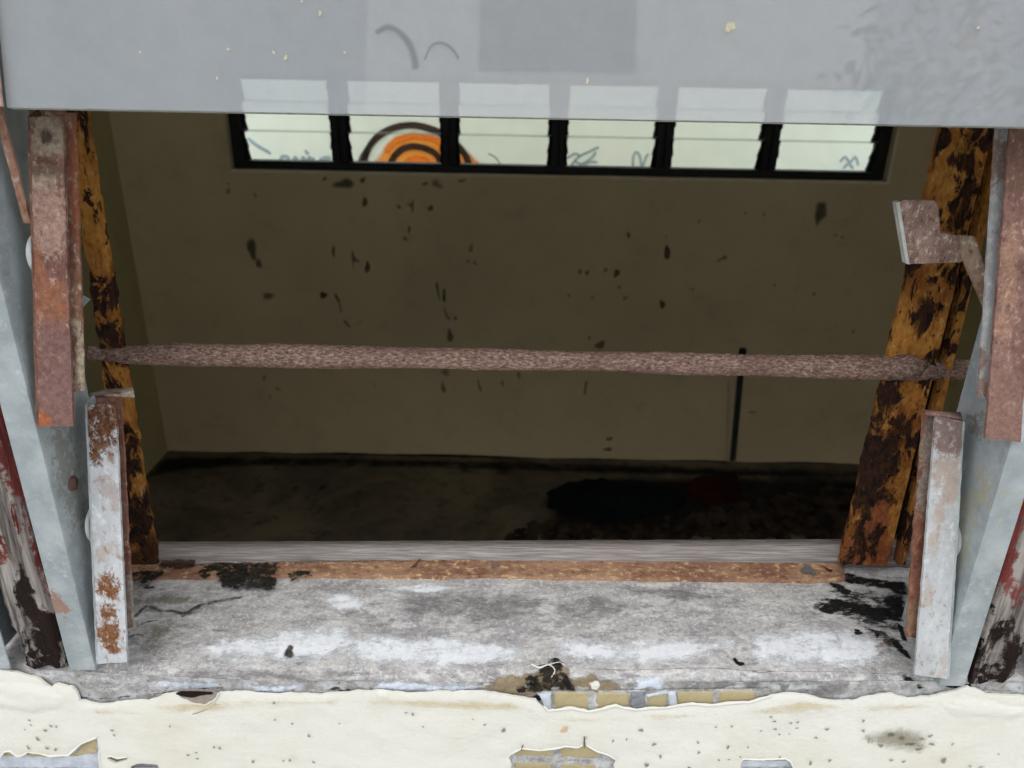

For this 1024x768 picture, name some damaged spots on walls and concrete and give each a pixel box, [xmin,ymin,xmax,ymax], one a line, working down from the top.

corrosion [800,565,832,575]
crack [129,596,242,638]
water stain [749,573,911,668]
spalling [176,688,219,706]
peeling [487,658,772,713]
peeling [0,737,158,768]
peeling [508,737,617,768]
peeling [740,758,794,768]